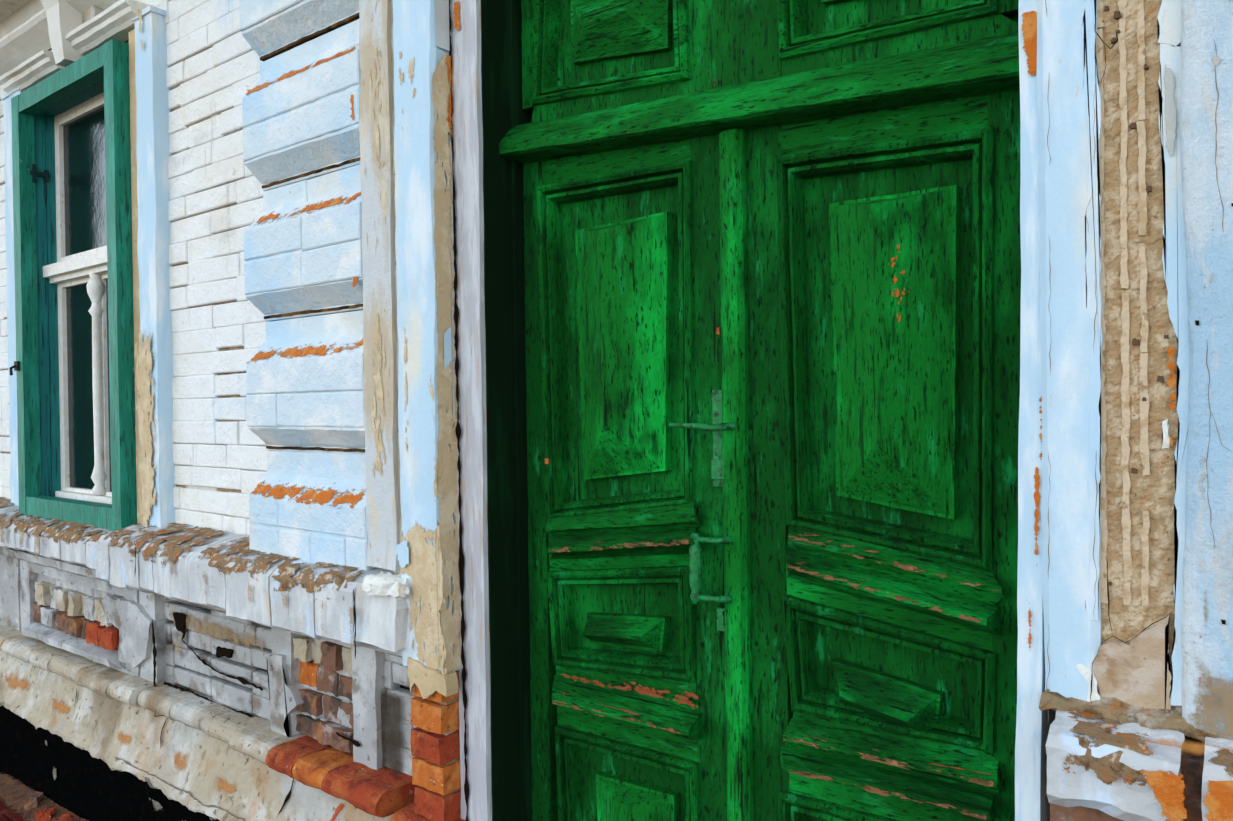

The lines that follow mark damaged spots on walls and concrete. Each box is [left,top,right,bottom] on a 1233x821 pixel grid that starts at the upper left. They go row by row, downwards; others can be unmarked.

peeling [1022,11,1037,75]
flaking render [1083,0,1207,706]
flaking render [0,0,466,821]
spalling [1064,710,1187,821]
peeling [1203,748,1233,821]